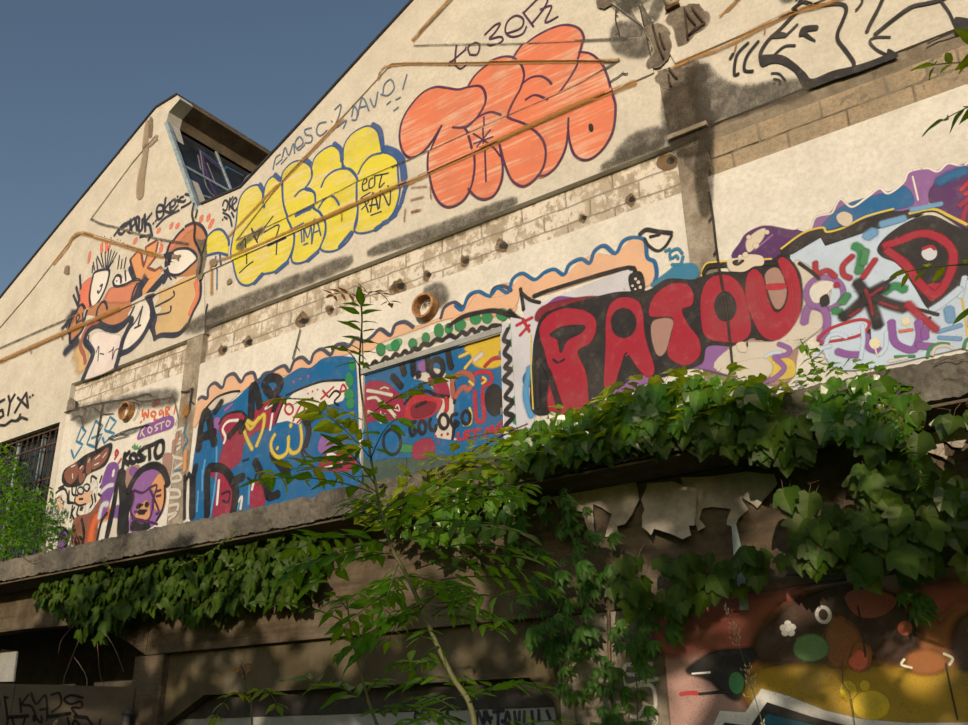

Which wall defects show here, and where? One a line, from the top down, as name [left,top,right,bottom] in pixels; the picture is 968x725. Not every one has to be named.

damp [236,0,664,255]
damp [600,62,813,215]
damp [184,256,352,333]
peeling [552,472,777,545]